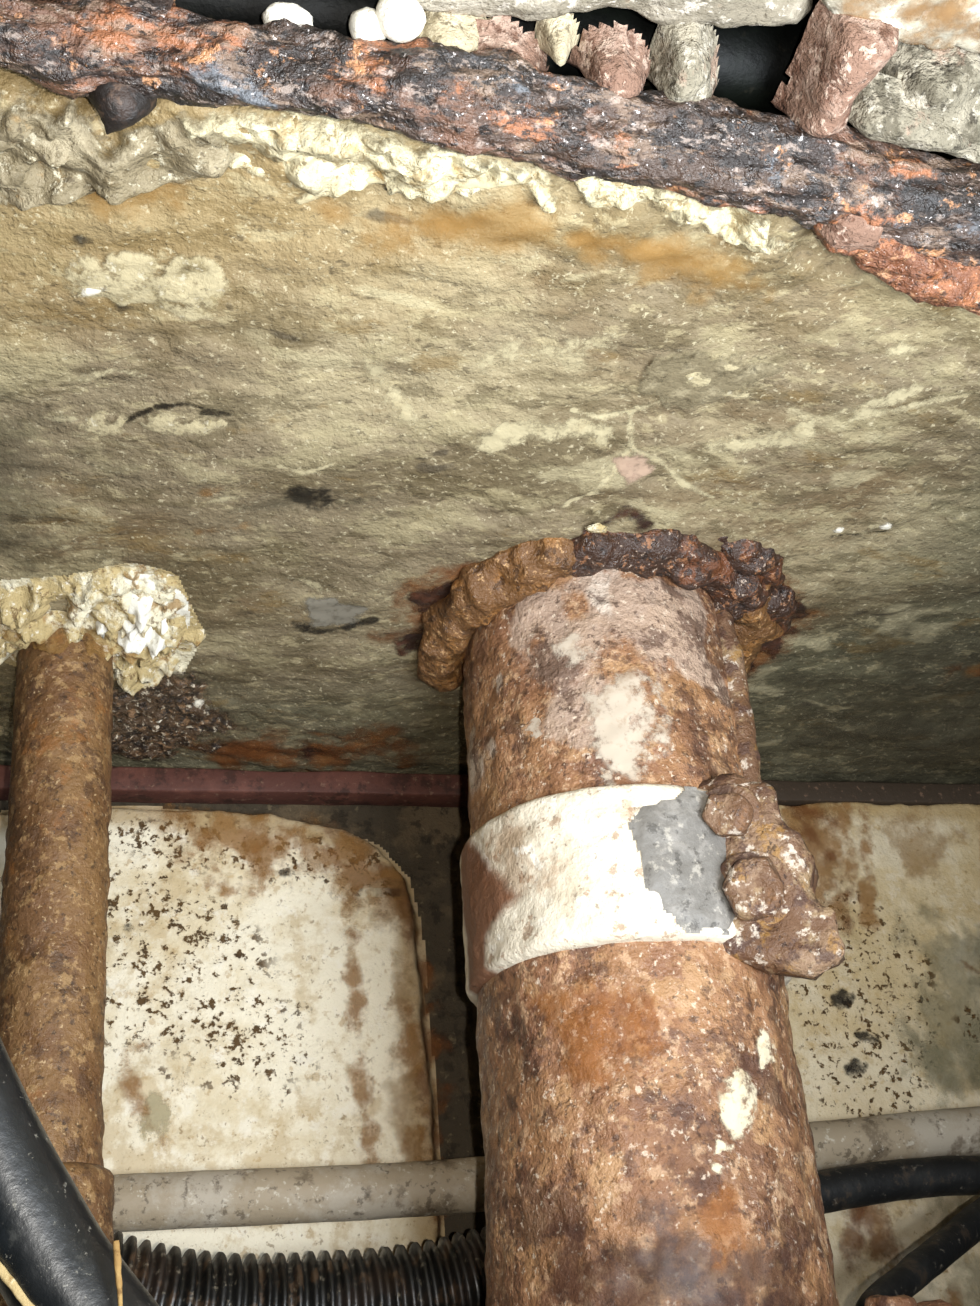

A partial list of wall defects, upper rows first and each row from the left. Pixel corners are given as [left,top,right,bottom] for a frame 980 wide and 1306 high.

spalling [0,0,980,321]
damp [0,563,206,696]
rust [389,506,815,692]
rust [191,727,408,771]